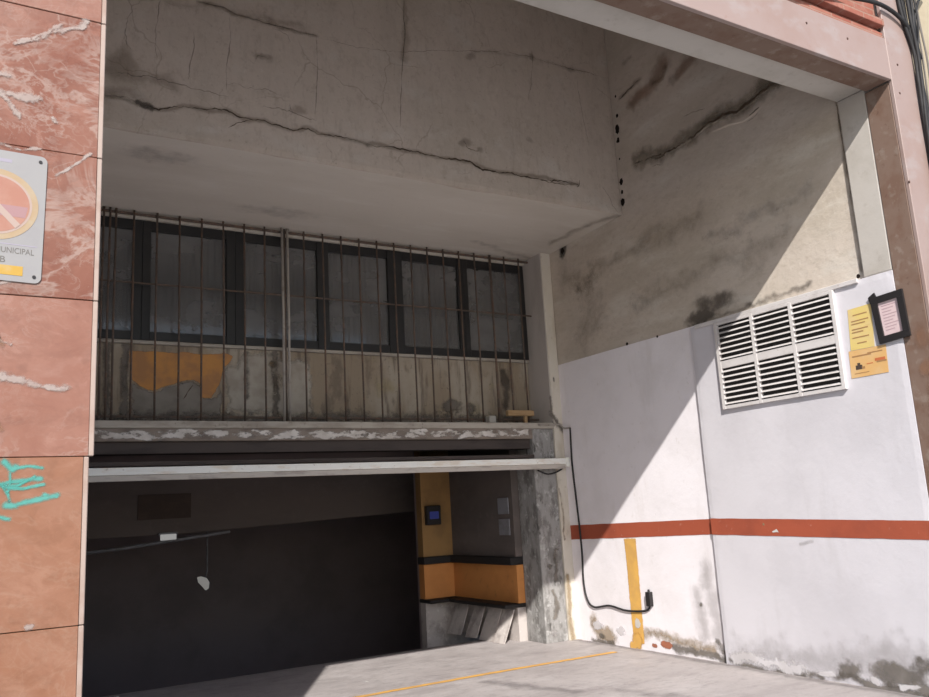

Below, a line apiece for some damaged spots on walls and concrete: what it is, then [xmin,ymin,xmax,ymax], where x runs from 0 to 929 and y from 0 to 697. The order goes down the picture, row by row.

crack [152,106,580,187]
crack [632,76,781,165]
peeling [129,351,312,417]
peeling [94,429,528,441]
peeling [731,650,836,678]